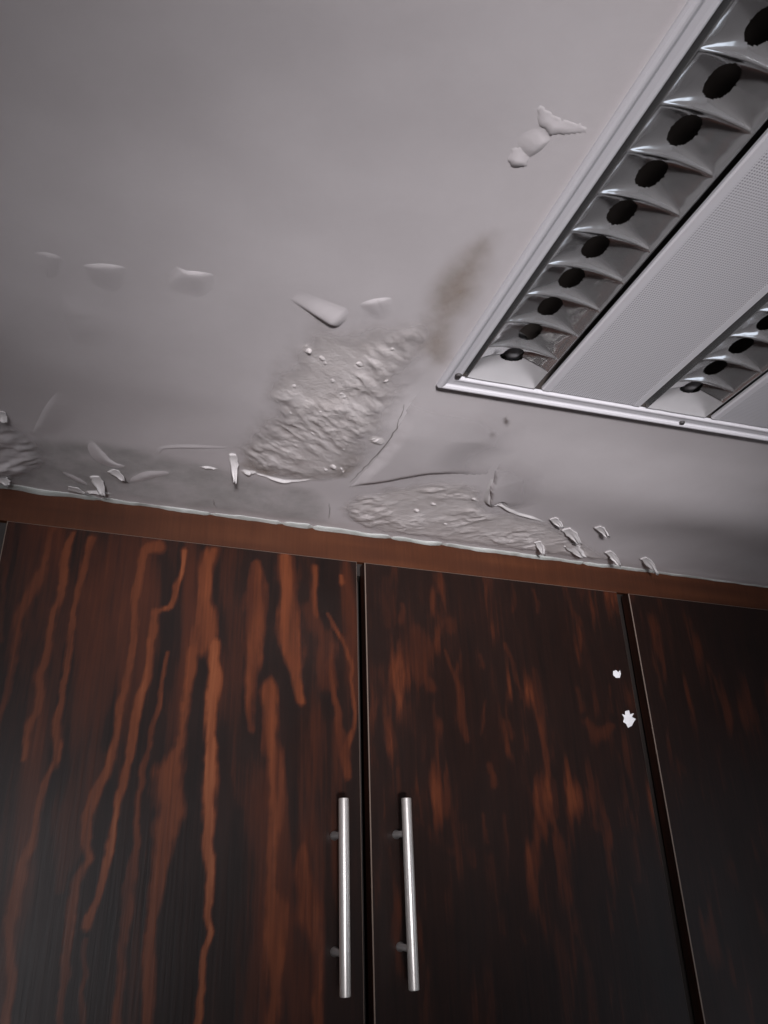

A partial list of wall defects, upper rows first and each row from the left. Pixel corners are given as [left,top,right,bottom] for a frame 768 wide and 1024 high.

peeling [0,411,41,487]
peeling [59,440,173,497]
flaking render [246,328,424,483]
crack [355,408,404,478]
peeling [348,473,621,567]
peeling [640,557,659,575]